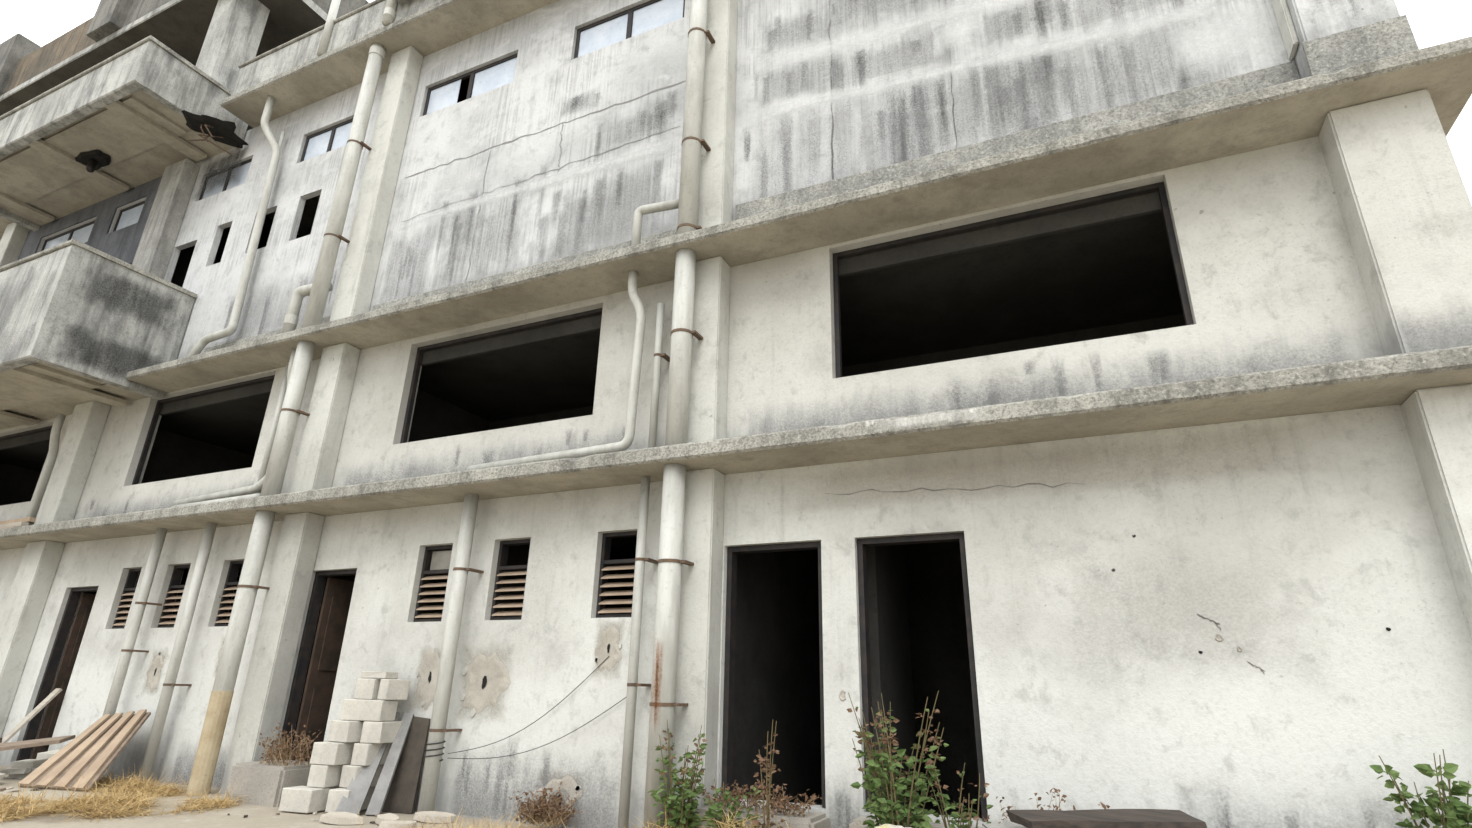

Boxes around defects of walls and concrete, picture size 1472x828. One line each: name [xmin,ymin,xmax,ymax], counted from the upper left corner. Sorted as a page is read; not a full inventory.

water stain [987,2,1045,37]
water stain [765,35,1205,187]
water stain [92,275,170,322]
water stain [72,329,156,375]